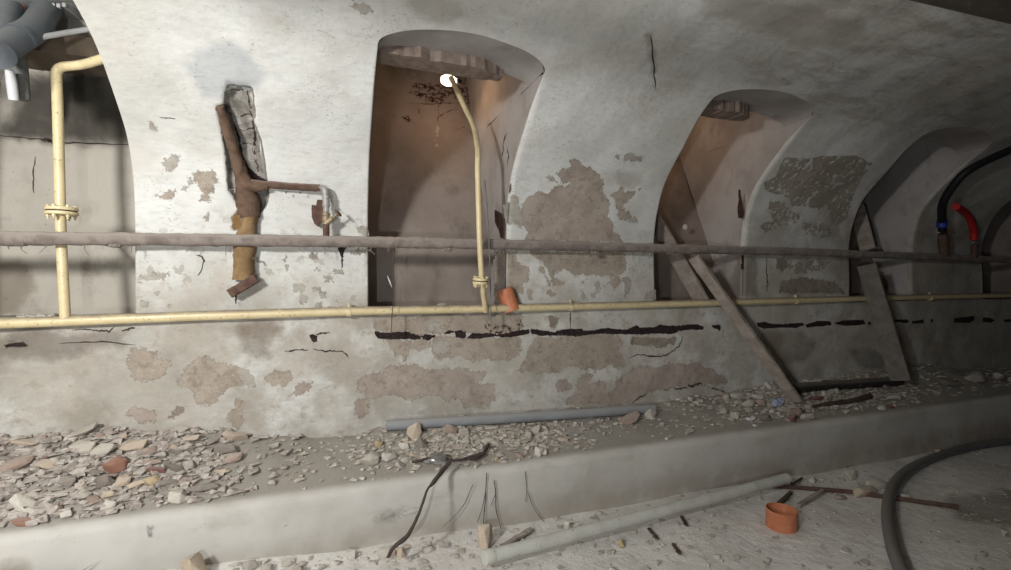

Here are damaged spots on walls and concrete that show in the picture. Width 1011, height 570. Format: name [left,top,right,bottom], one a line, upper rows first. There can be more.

peeling [408,83,470,106]
spalling [156,84,269,222]
peeling [615,153,642,163]
peeling [760,155,872,238]
rust [231,211,241,230]
peeling [354,158,728,419]
crack [5,340,28,348]
crack [285,332,349,359]
crack [375,311,721,359]
crack [757,320,871,329]
crack [895,316,1011,324]
peeling [125,346,313,431]